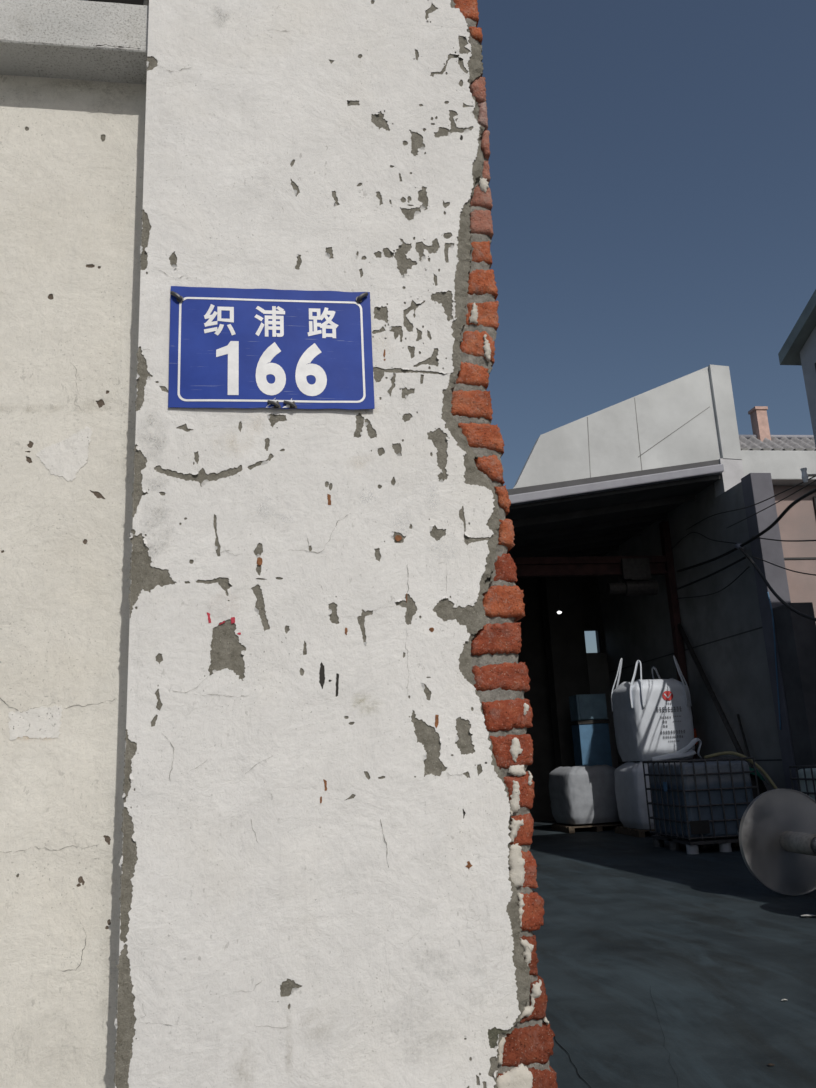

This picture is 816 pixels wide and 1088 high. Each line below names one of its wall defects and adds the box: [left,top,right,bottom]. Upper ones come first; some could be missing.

peeling [128,414,287,631]
peeling [204,619,246,681]
flaking render [354,0,558,1088]
peeling [103,729,138,1088]